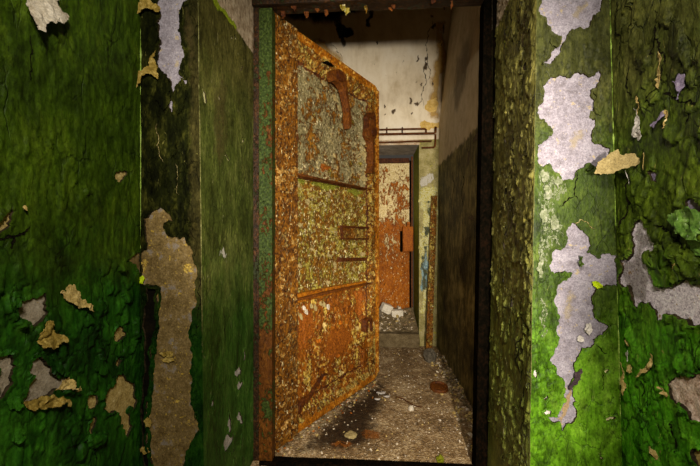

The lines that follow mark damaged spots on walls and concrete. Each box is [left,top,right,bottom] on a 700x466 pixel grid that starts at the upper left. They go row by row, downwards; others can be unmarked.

spalling [0,0,207,466]
crack [415,21,433,106]
peeling [519,0,700,434]